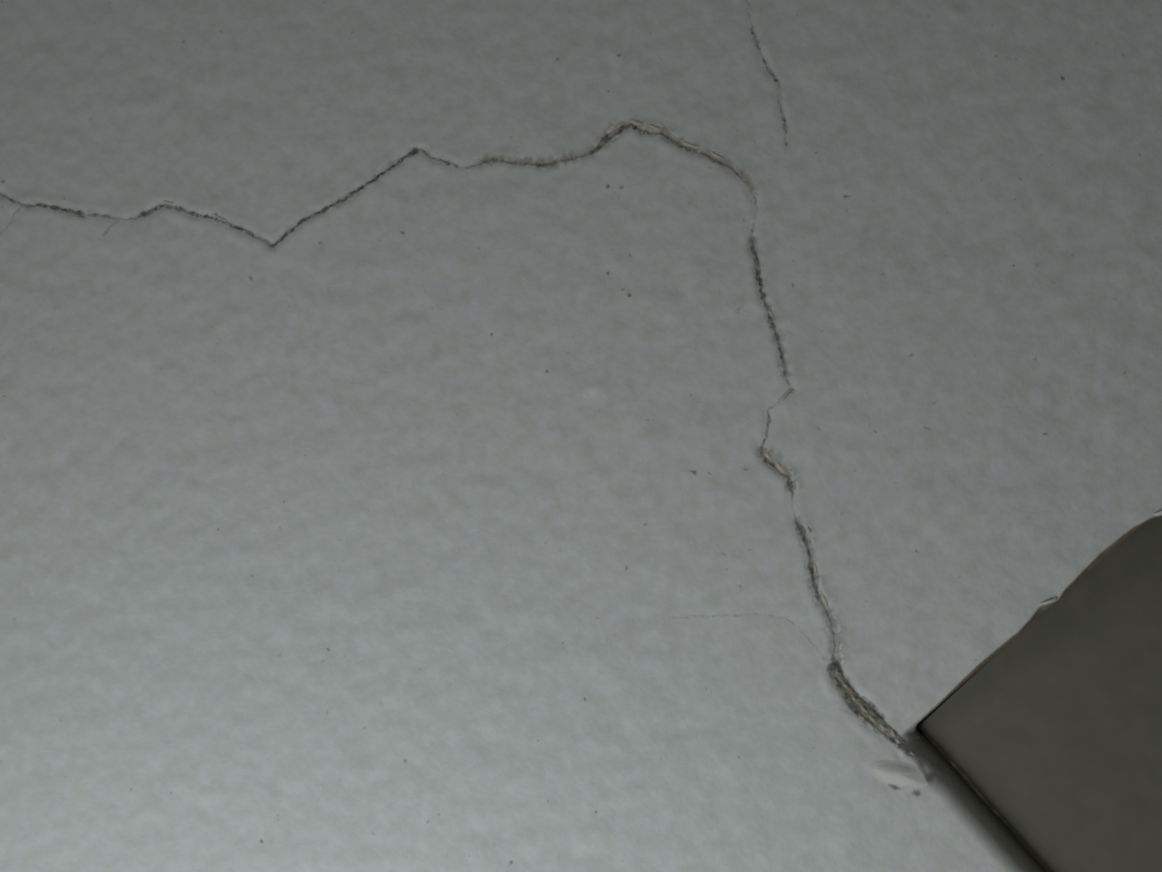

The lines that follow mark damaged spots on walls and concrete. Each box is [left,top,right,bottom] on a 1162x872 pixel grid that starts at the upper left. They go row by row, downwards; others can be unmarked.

crack [9,199,86,220]
crack [141,148,454,247]
crack [482,119,754,188]
crack [751,247,791,400]
crack [760,439,794,492]
crack [797,523,841,661]